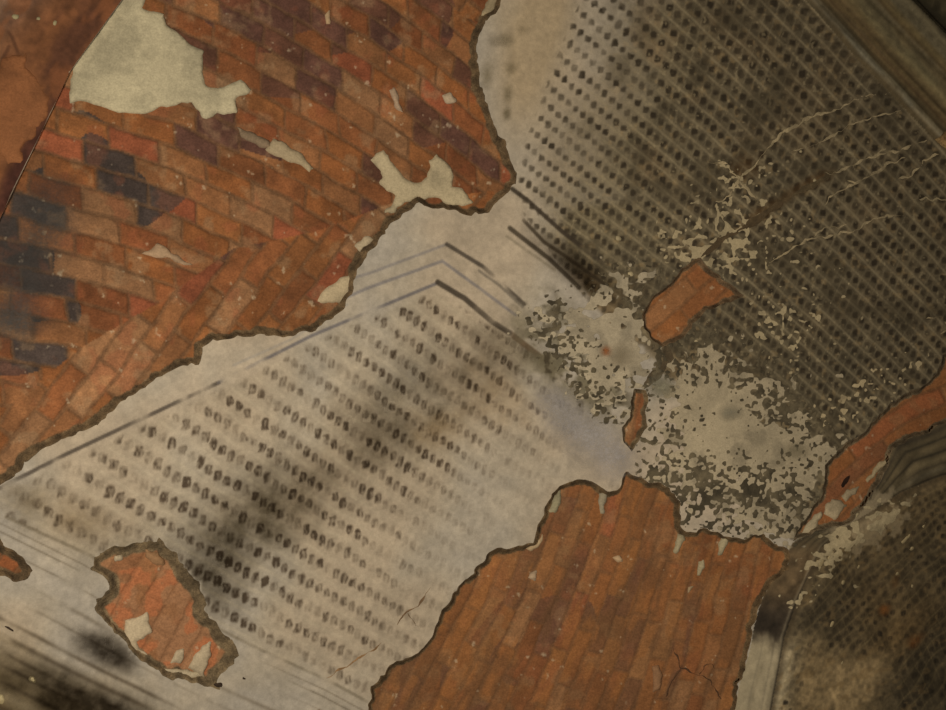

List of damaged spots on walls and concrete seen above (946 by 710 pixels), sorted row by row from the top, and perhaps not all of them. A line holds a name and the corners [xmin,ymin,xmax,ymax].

spalling [0,0,517,485]
crack [699,94,946,263]
spalling [368,160,946,710]
spalling [0,539,33,582]
water stain [38,672,127,710]
water stain [85,635,128,666]
spalling [90,538,239,690]